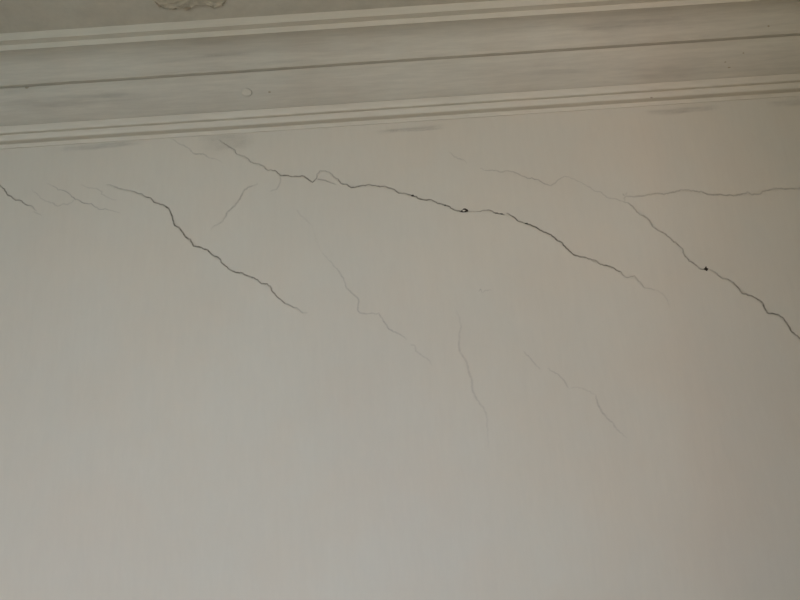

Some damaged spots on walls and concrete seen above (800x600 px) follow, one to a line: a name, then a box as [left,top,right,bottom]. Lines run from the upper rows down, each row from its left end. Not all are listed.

crack [105,185,308,315]
crack [218,140,656,292]